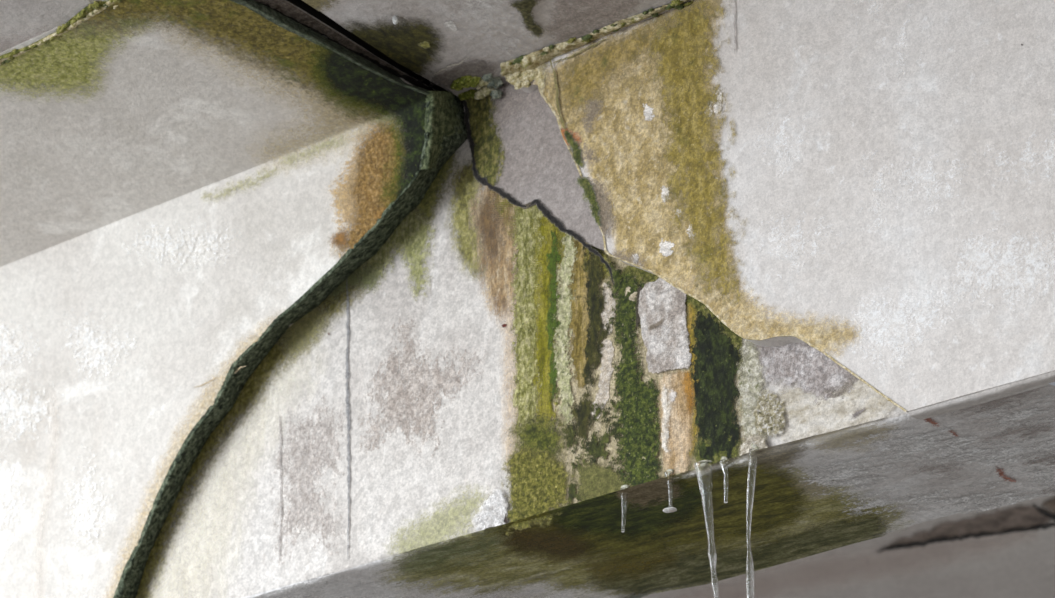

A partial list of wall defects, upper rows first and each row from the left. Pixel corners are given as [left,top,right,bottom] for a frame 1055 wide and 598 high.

water stain [467,0,643,55]
water stain [433,60,495,87]
peeling [643,104,655,121]
peeling [706,89,725,117]
peeling [659,240,674,257]
crack [113,0,614,598]
water stain [281,151,893,535]
spalling [590,277,691,420]
water stain [107,323,269,598]
water stain [269,396,347,563]
spalling [473,488,508,531]
crack [875,504,1055,554]